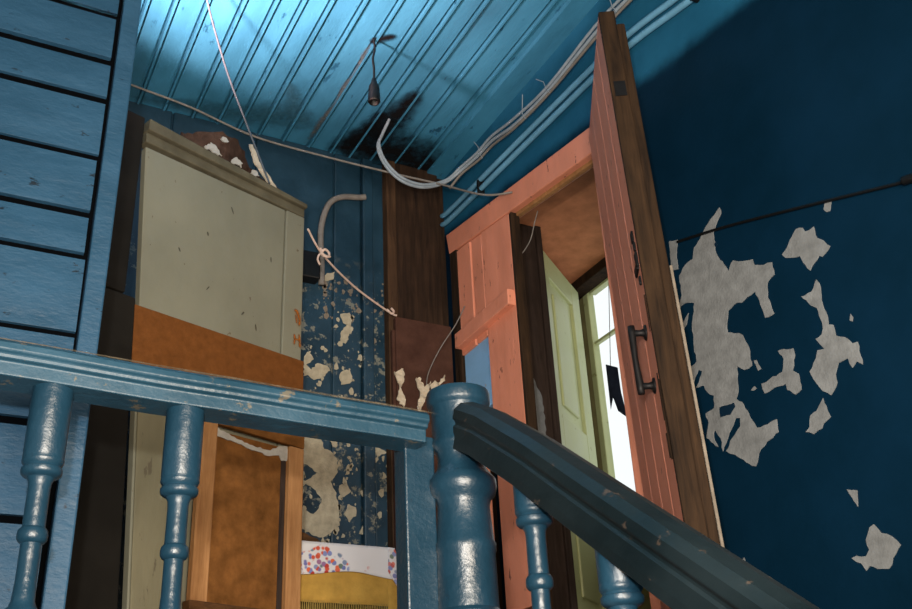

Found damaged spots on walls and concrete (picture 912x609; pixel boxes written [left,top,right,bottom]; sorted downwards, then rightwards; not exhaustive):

peeling [782,227,830,271]
peeling [303,272,362,397]
peeling [669,208,779,466]
peeling [751,280,863,434]
peeling [302,437,363,544]
peeling [375,447,387,498]
peeling [852,524,901,571]